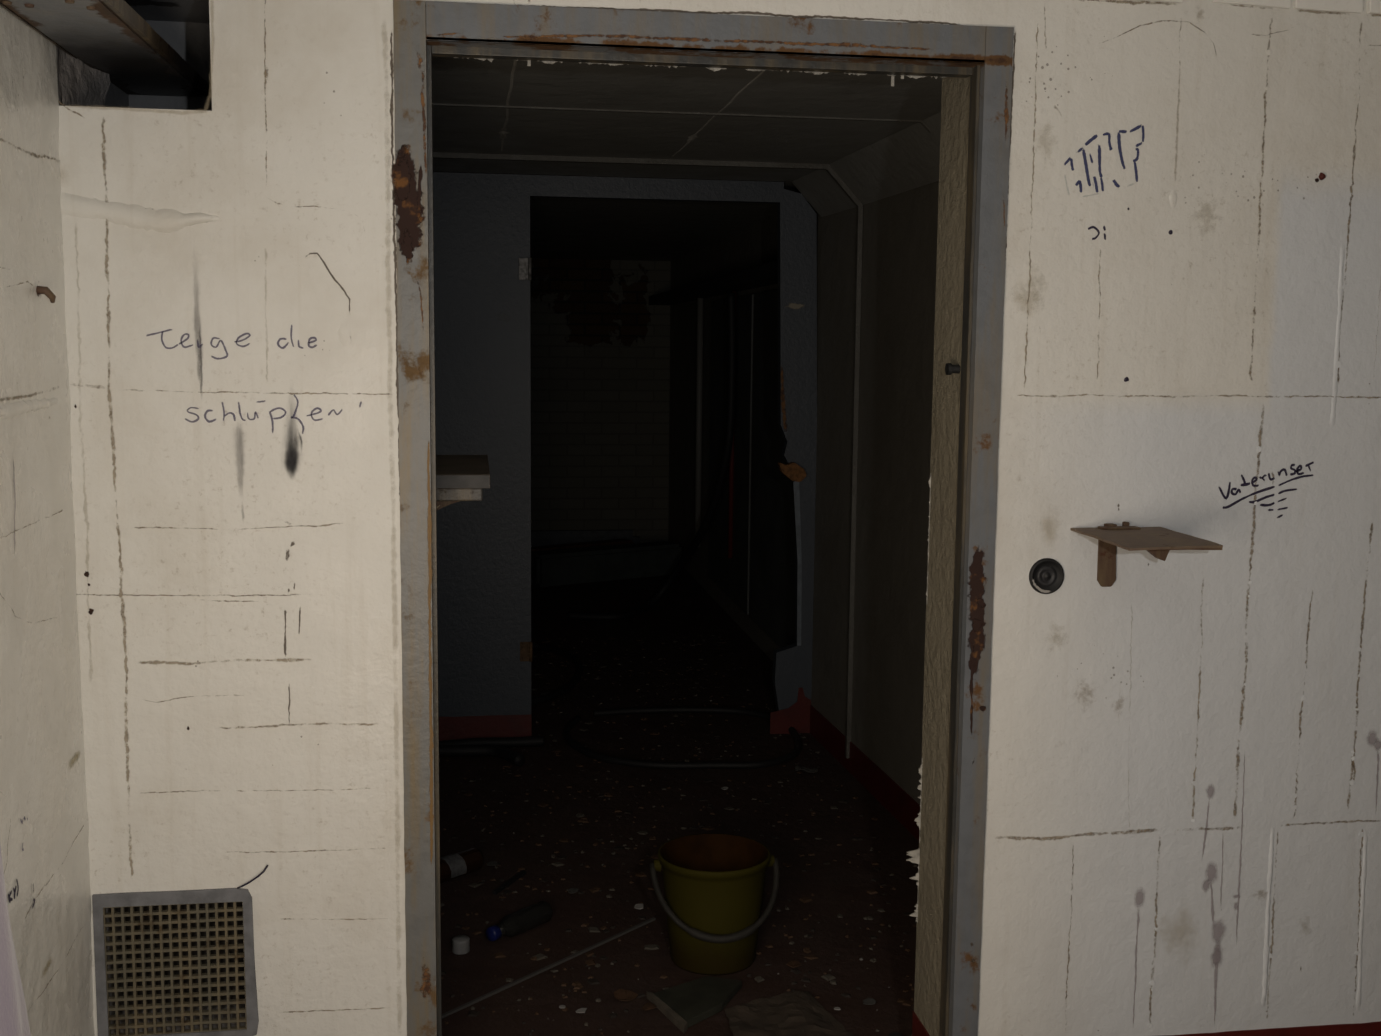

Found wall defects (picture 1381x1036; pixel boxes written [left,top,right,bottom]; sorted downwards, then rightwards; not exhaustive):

corrosion [503,34,929,50]
corrosion [391,56,427,263]
corrosion [967,548,986,733]
peeling [906,758,923,923]